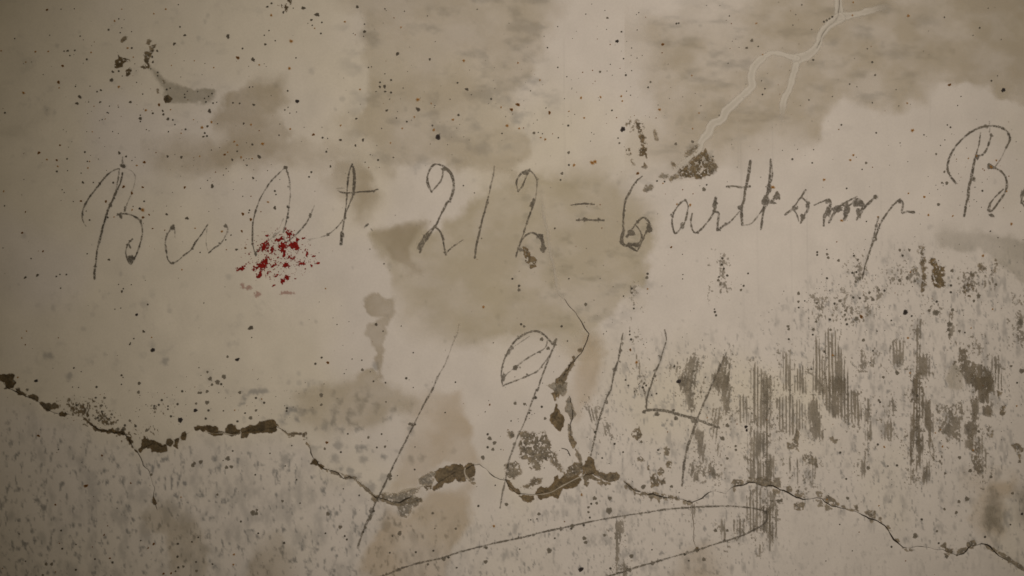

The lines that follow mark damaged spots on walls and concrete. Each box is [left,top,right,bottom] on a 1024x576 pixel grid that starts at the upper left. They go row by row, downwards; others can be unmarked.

flaking render [643,140,718,192]
crack [681,0,878,166]
crack [0,215,1024,570]
flaking render [505,417,562,488]